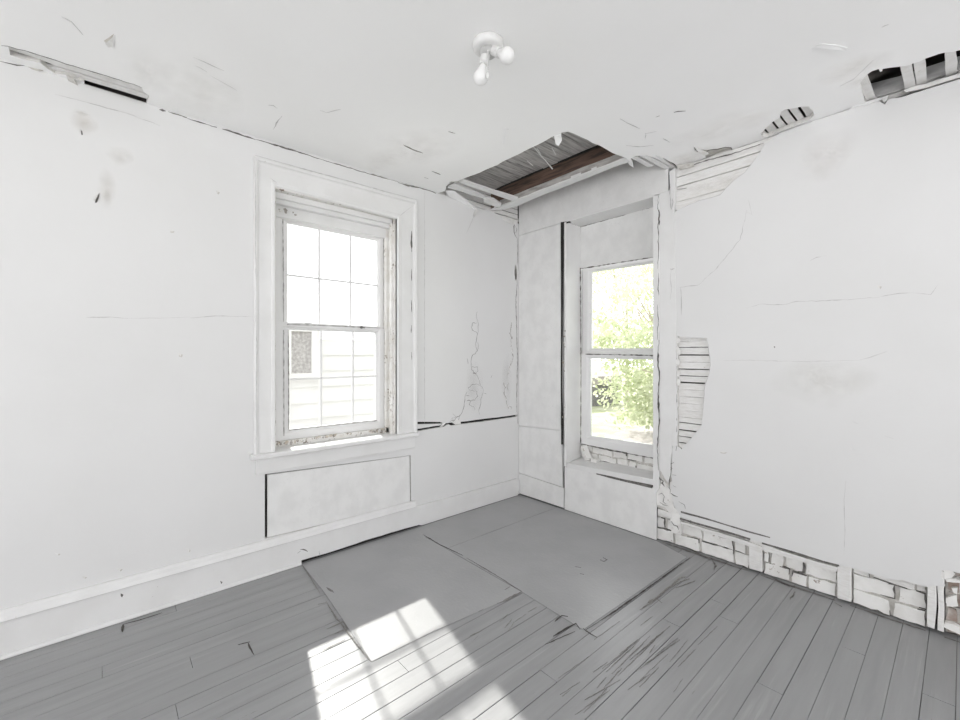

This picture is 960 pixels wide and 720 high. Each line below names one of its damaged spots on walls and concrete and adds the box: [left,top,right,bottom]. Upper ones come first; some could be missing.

spalling [440,181,518,229]
spalling [676,135,777,211]
crack [56,94,518,440]
spalling [675,337,711,448]
flaking render [580,444,653,471]
crack [546,184,959,715]
flaking render [657,506,749,568]
flaking render [764,551,837,597]
flaking render [853,569,927,627]
flaking render [942,570,960,636]